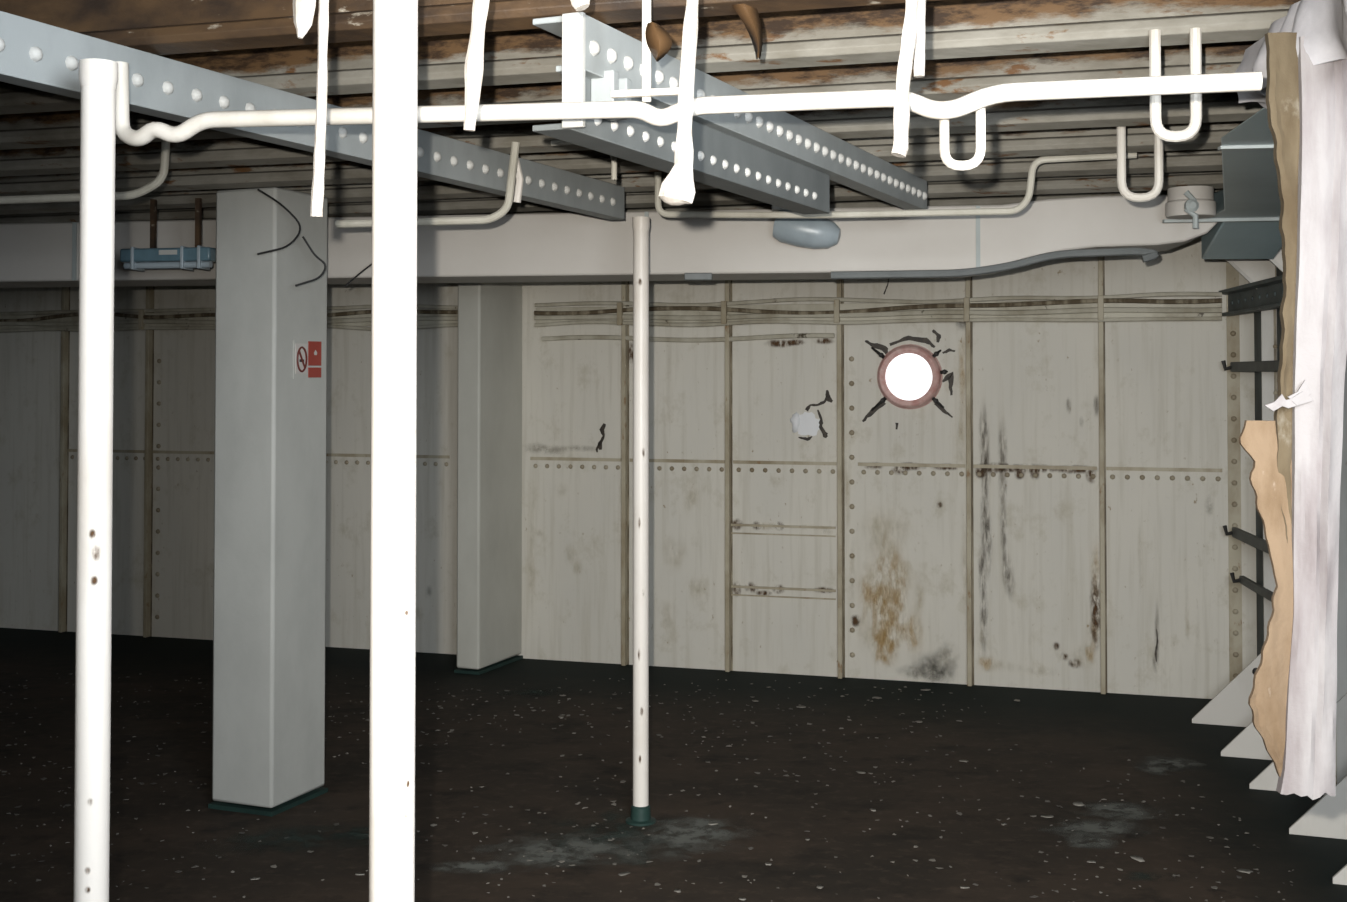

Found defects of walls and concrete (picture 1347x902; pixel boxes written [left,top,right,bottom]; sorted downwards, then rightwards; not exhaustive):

peeling [790,390,833,441]